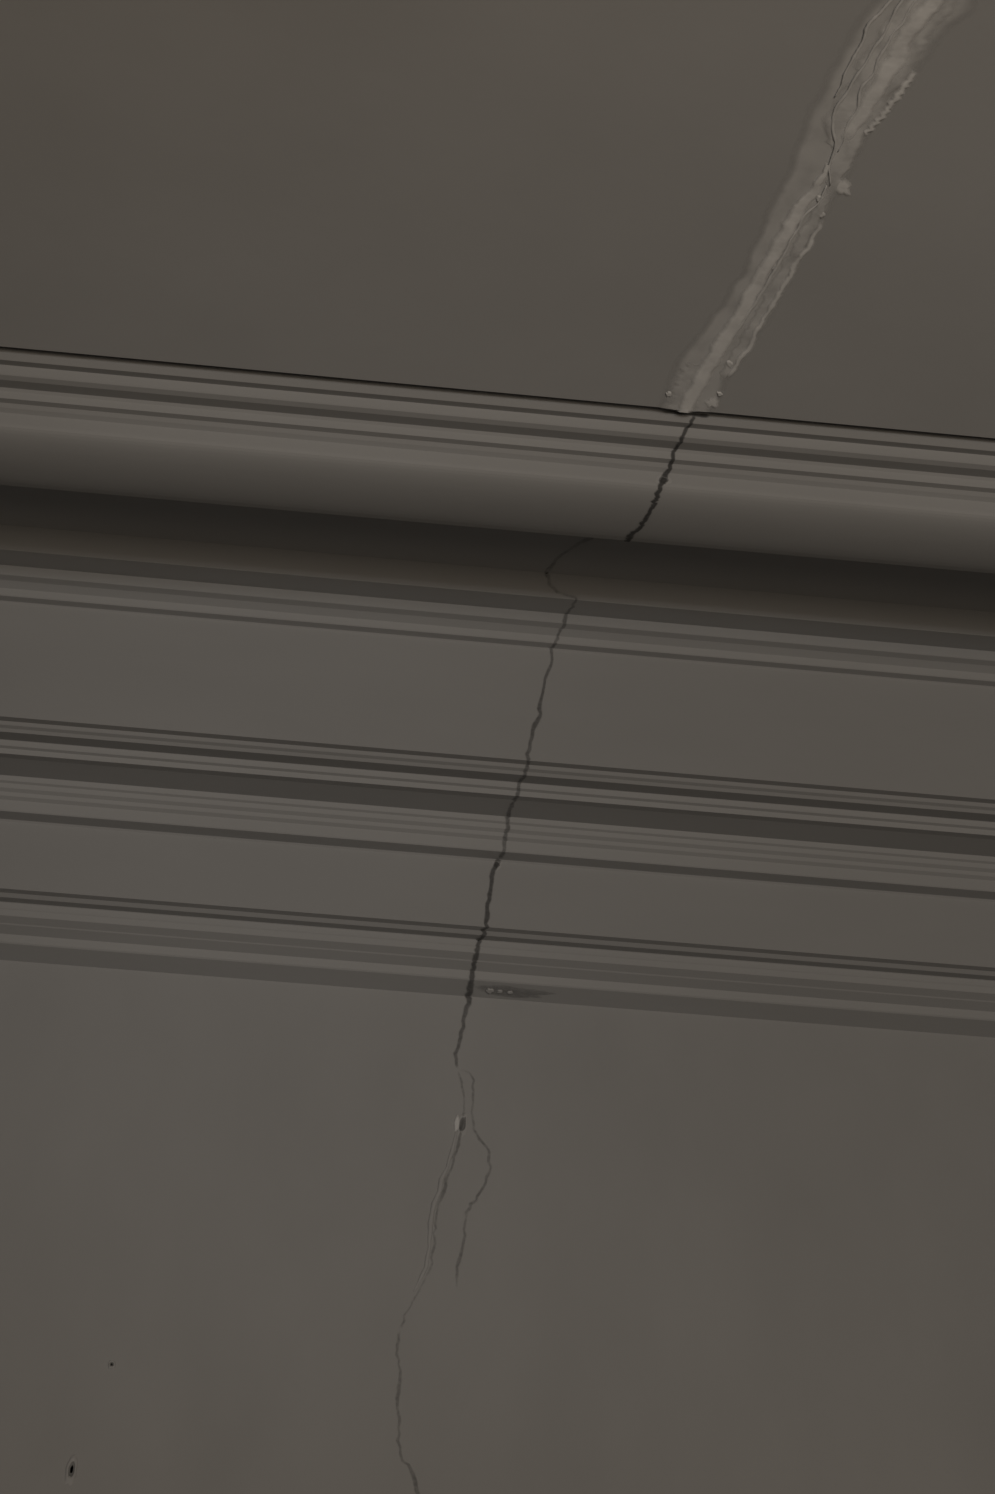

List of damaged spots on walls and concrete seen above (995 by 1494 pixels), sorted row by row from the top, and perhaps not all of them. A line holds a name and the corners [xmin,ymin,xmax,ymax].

damp [844,0,944,138]
damp [678,164,829,413]
crack [625,411,707,542]
crack [466,863,498,1003]